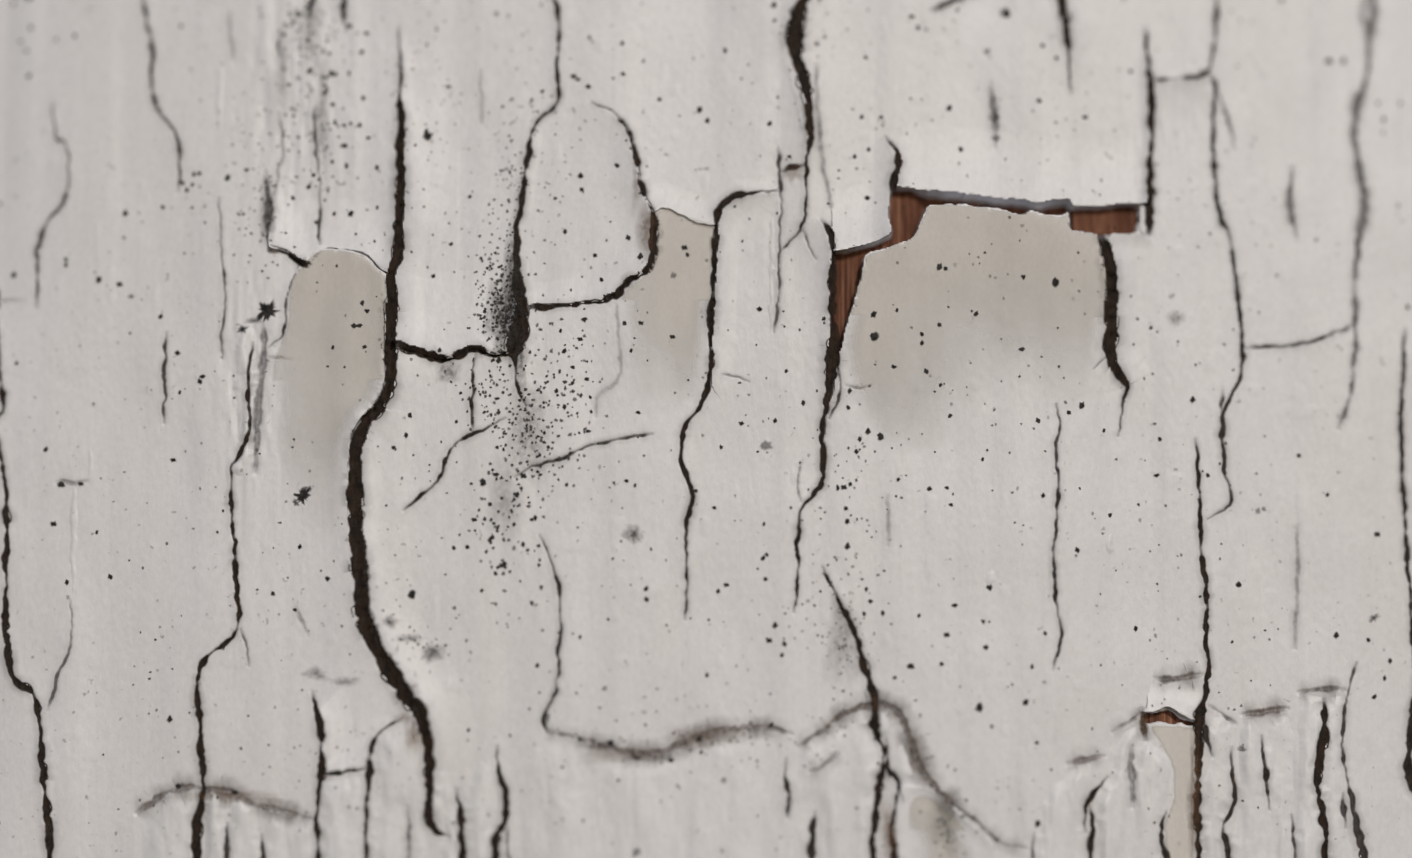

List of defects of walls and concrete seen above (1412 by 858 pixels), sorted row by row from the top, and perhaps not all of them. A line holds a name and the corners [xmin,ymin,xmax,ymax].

peeling [779,26,805,130]
crack [1057,0,1071,87]
crack [0,371,69,858]
crack [142,0,660,858]
peeling [231,75,1215,774]
crack [531,0,1034,858]
crack [1074,712,1148,858]
crack [1098,234,1130,429]
peeling [1143,681,1203,858]
crack [1144,0,1377,858]
crack [1398,335,1412,646]
crack [1403,698,1412,792]